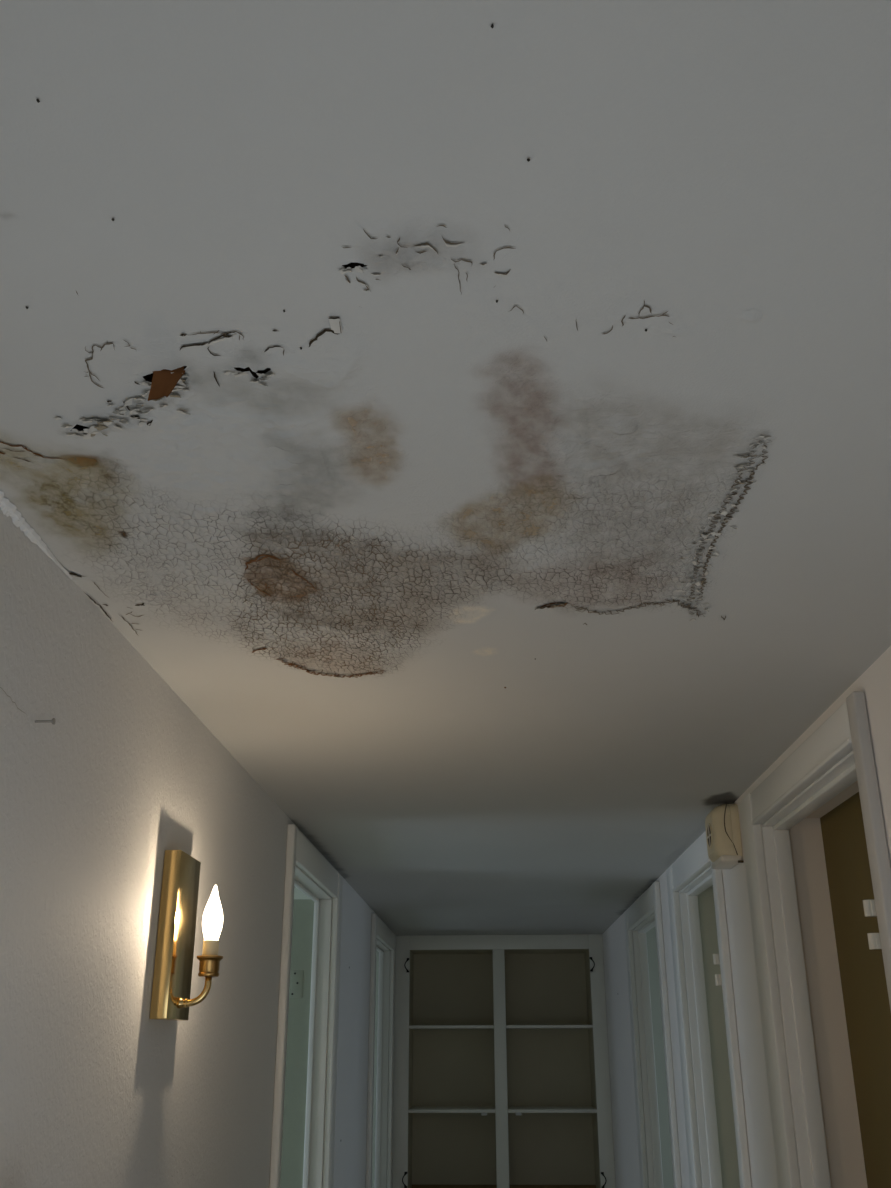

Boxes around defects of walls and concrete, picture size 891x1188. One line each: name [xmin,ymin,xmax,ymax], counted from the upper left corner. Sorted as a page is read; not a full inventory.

crack [83,340,153,426]
peeling [54,372,191,439]
crack [0,441,67,462]
crack [68,572,145,635]
crack [231,526,512,678]
crack [540,568,726,625]